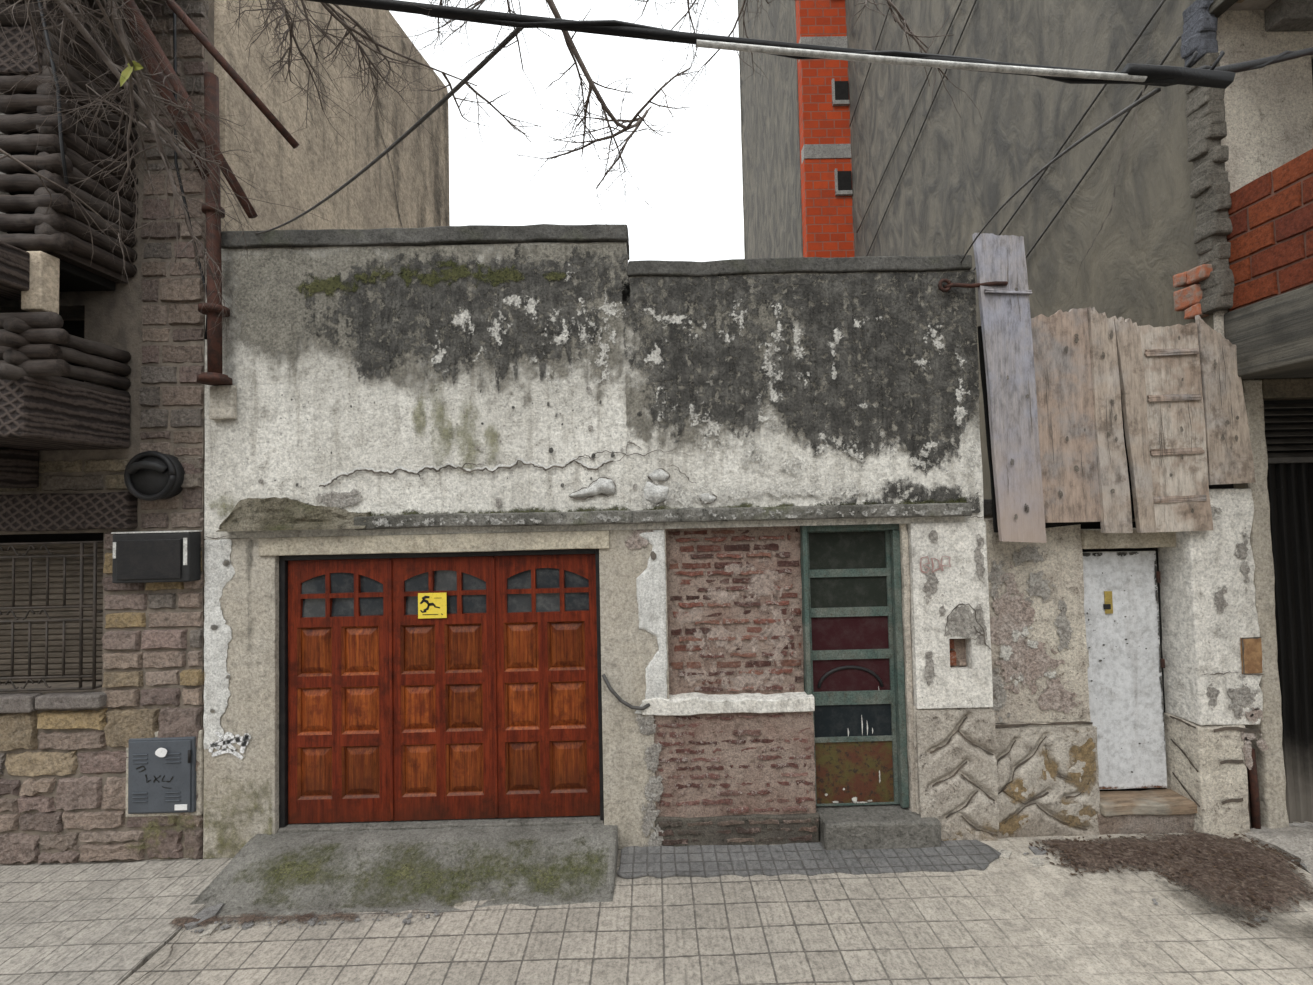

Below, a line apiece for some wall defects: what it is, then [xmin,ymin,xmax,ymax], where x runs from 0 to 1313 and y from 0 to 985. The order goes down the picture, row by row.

peeling [203,539,235,749]
crack [319,442,697,487]
water stain [222,243,981,516]
peeling [372,292,980,847]
peeling [923,530,1130,722]